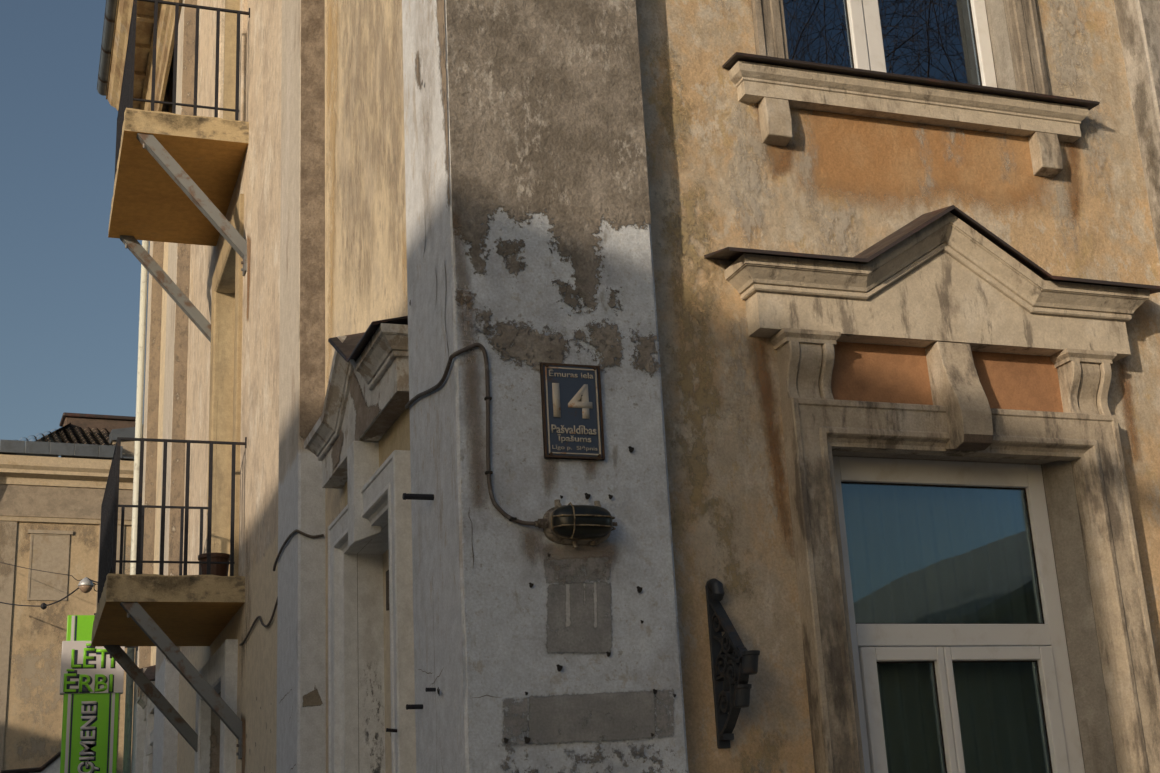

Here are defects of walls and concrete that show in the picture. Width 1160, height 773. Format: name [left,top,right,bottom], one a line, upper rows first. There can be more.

leakage [1135,86,1146,129]
peeling [436,0,661,377]
peeling [564,743,675,773]